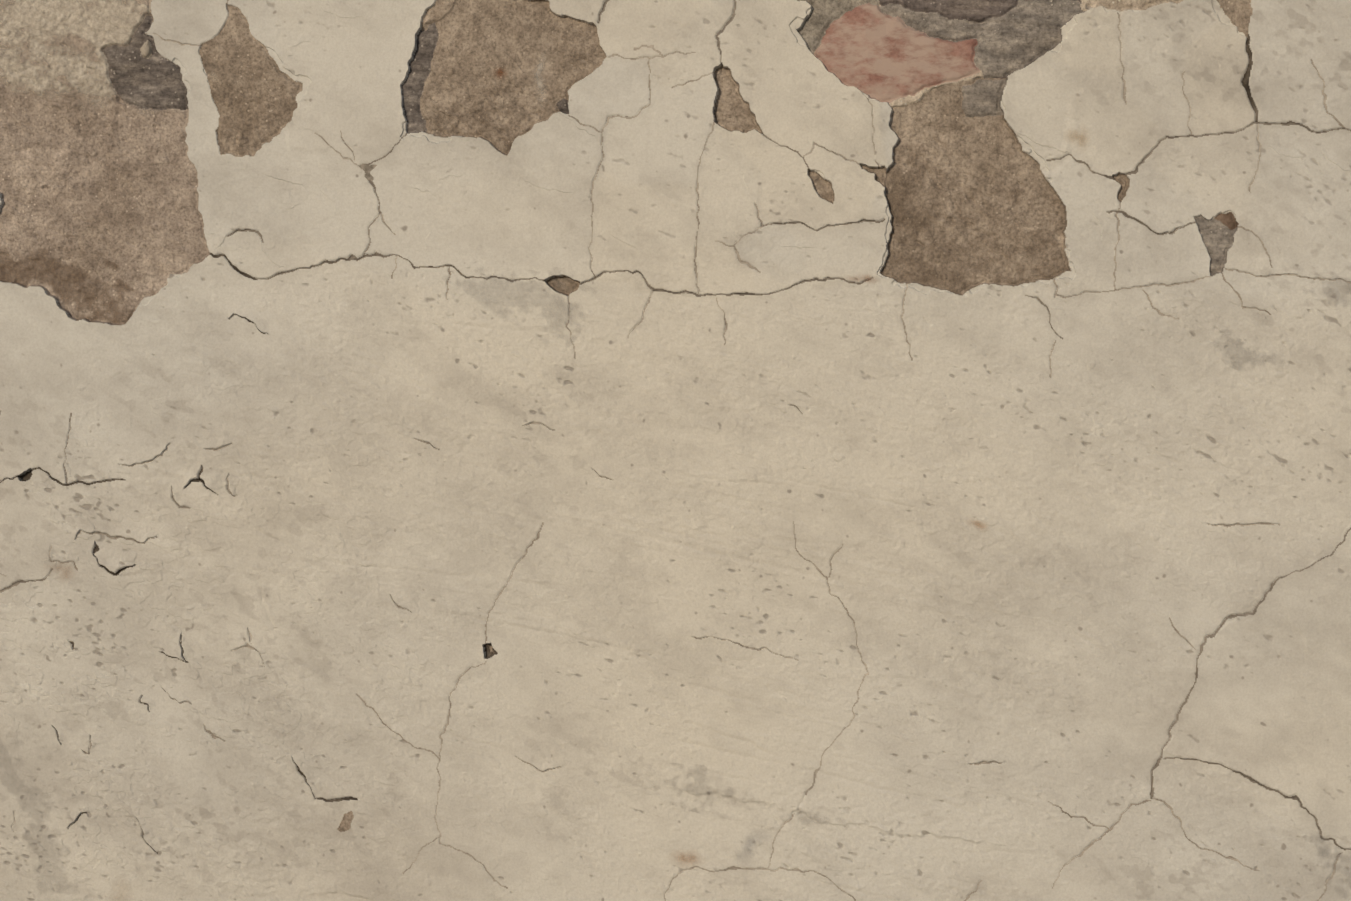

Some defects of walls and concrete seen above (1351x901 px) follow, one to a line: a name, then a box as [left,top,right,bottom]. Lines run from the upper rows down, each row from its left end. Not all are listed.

crack [0,546,78,593]
crack [0,413,125,486]
spalling [0,0,210,325]
peeling [227,308,269,334]
crack [357,522,544,889]
crack [210,0,885,359]
peeling [199,0,1351,297]
crack [901,284,913,361]
crack [1117,12,1127,105]
crack [1025,34,1351,378]
crack [1048,528,1351,901]